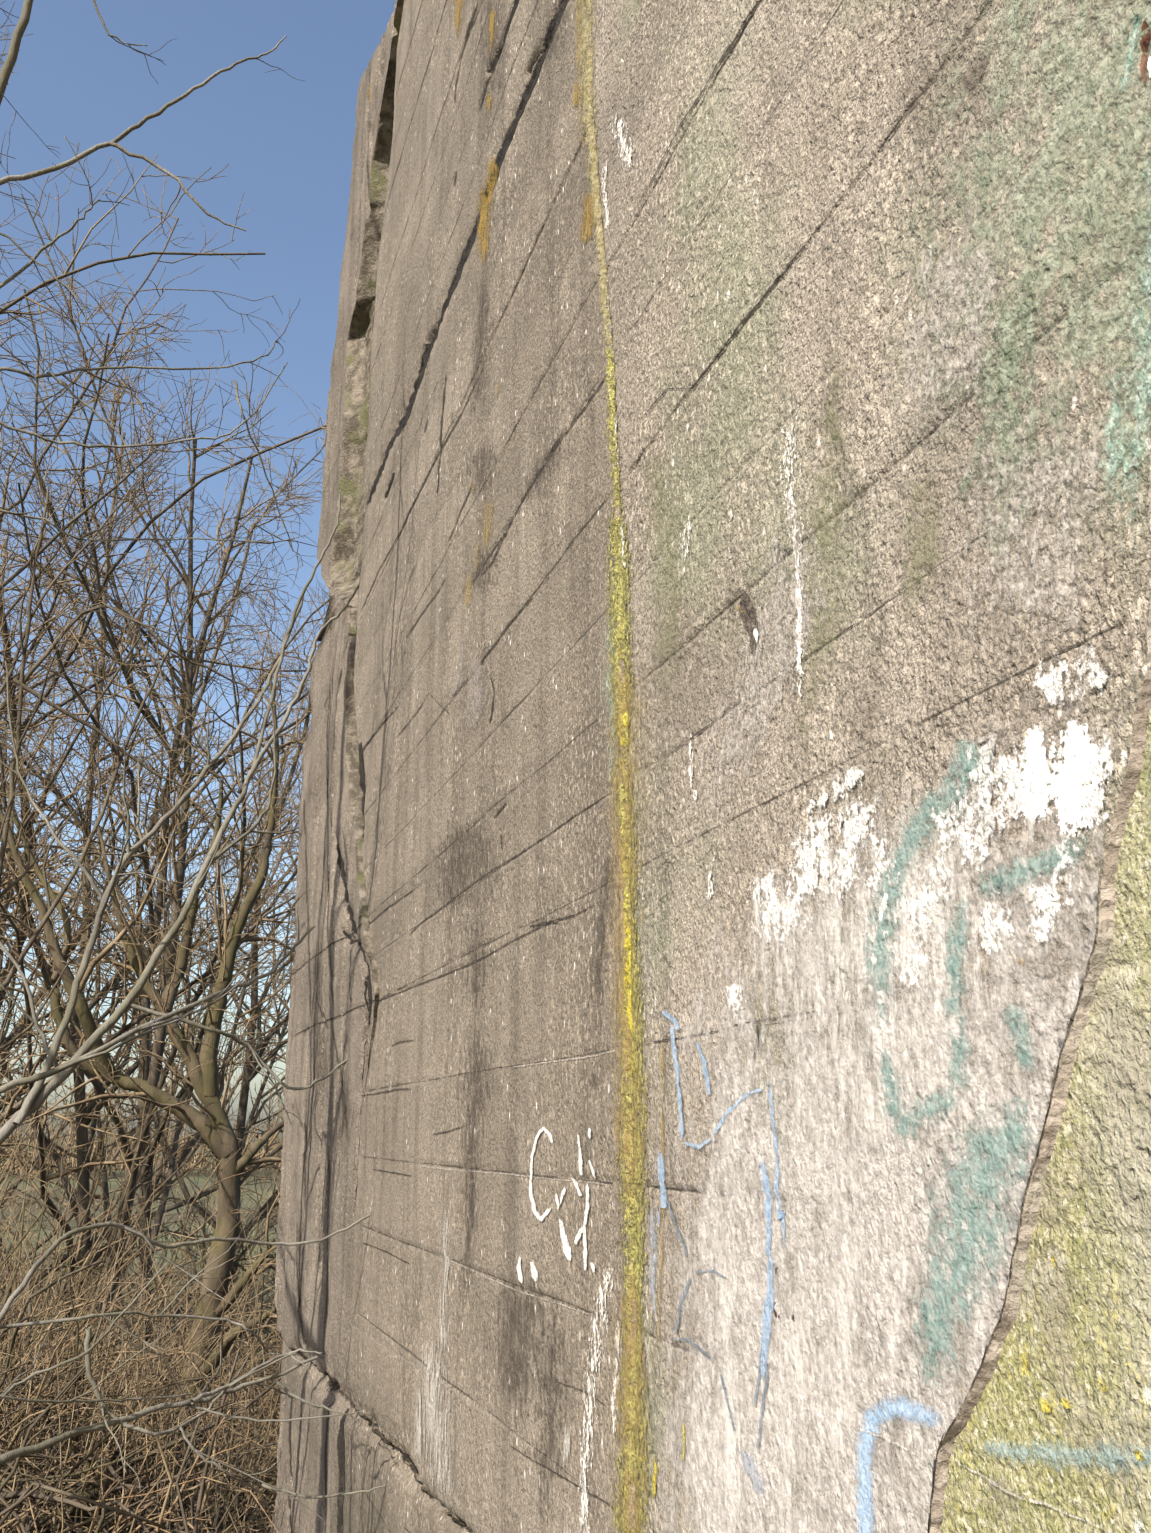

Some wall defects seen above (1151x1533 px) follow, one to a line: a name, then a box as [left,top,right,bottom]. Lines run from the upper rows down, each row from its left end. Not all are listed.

spalling [270,0,398,1533]
crack [288,597,616,1533]
crack [362,0,569,608]
corrosion [477,157,499,264]